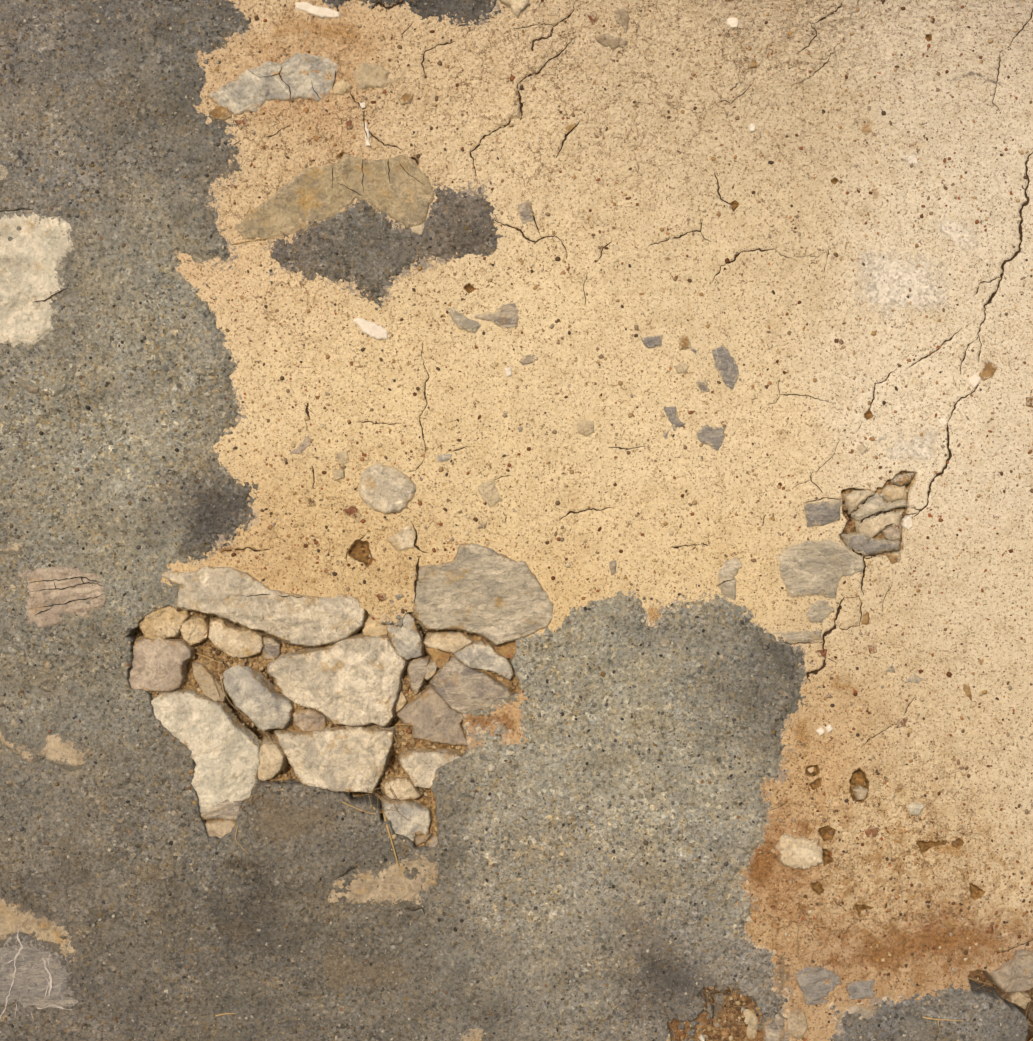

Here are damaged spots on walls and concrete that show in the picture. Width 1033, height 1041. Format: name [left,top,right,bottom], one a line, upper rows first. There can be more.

spalling [295,2,341,19]
crack [470,1,576,176]
crack [556,121,580,158]
crack [714,171,730,204]
crack [649,219,709,246]
crack [713,248,829,280]
crack [786,153,1033,681]
spalling [869,471,916,556]
spalling [346,539,373,567]
spalling [175,633,346,739]
spalling [849,768,869,804]
spalling [818,825,836,866]